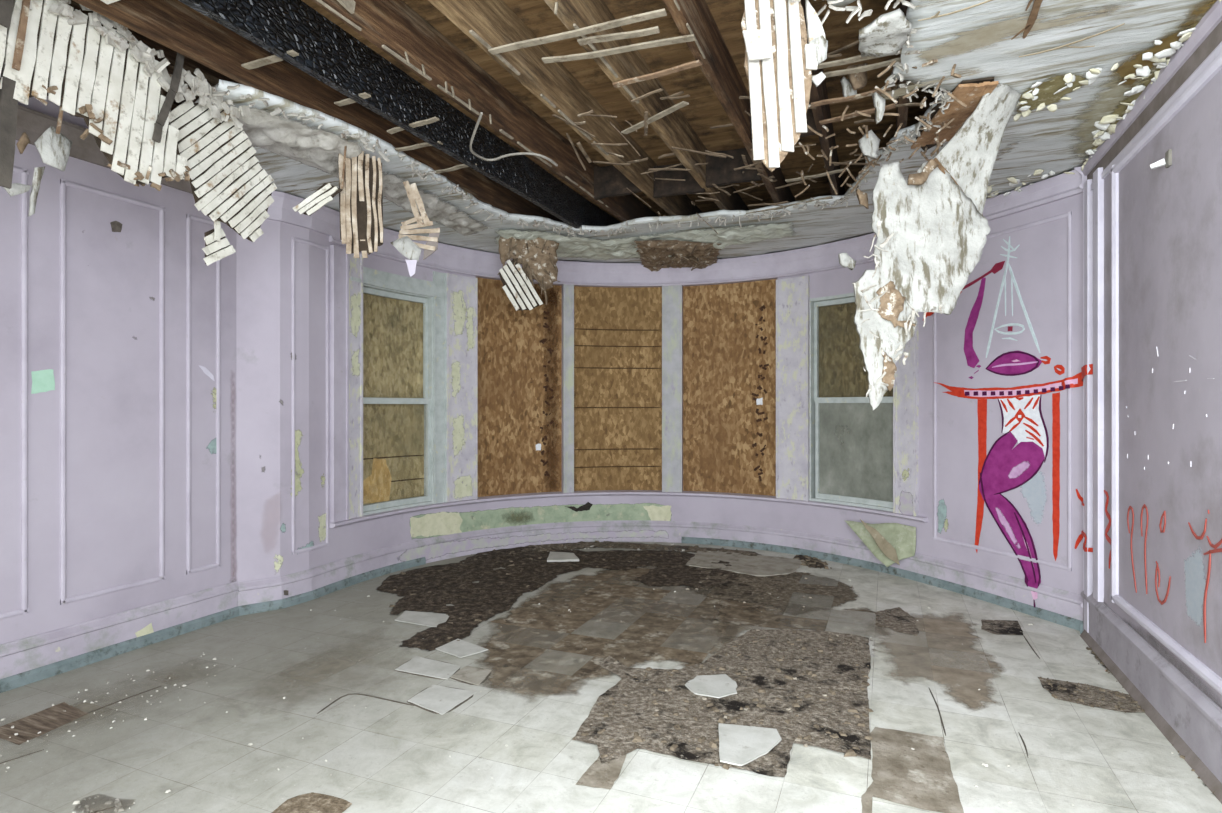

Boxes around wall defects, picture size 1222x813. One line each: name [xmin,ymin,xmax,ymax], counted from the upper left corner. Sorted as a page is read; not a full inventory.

flaking render [792,0,915,97]
peeling [4,104,113,216]
spalling [107,161,191,191]
flaking render [212,29,954,277]
peeling [987,27,1196,198]
peeling [376,475,858,651]
peeling [844,519,916,567]
peeling [875,607,919,636]
peeling [0,702,88,745]
peeling [572,629,964,813]
peeling [1038,677,1145,713]
peeling [272,792,352,813]